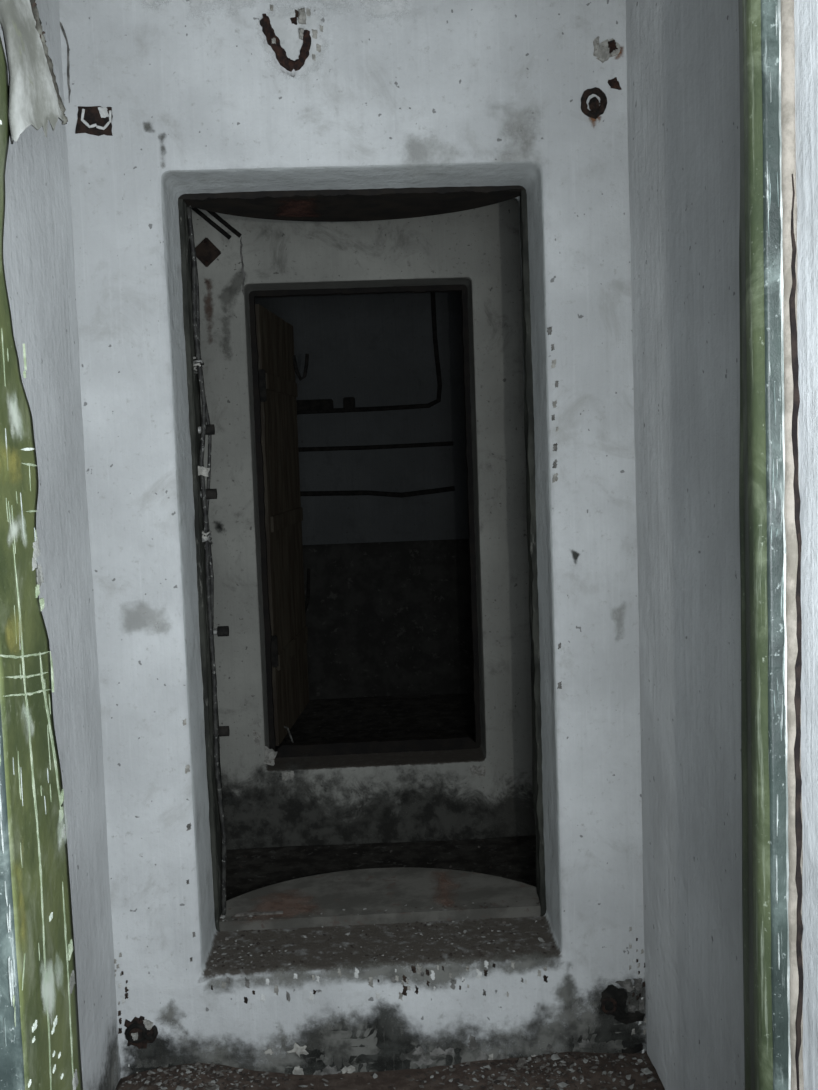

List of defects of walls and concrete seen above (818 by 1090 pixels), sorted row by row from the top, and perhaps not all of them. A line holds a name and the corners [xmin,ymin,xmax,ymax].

peeling [0,0,68,144]
crack [60,22,71,103]
spalling [593,36,623,63]
damp [221,765,500,850]
peeling [114,953,153,1041]
damp [98,975,647,1090]